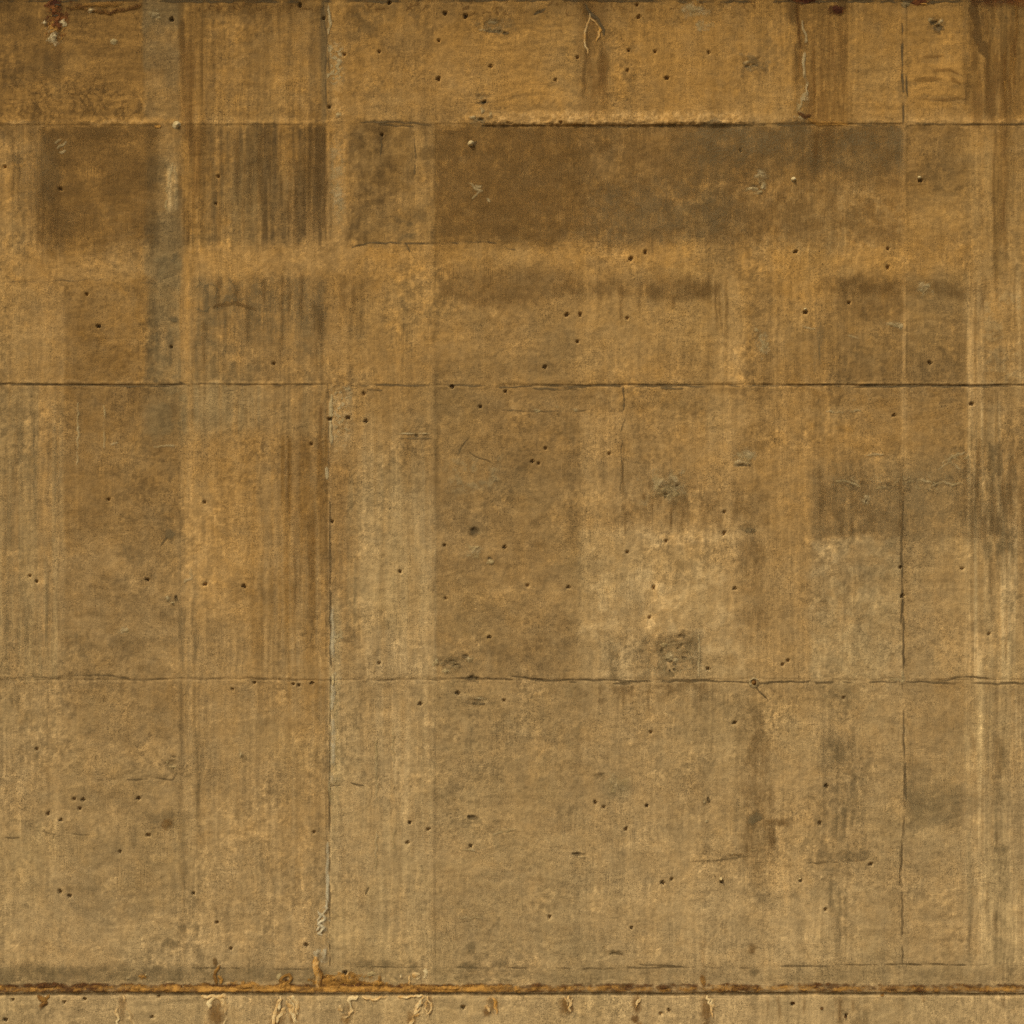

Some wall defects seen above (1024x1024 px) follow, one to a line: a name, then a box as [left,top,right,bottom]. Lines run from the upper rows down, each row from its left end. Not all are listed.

rust [0,959,1024,1008]